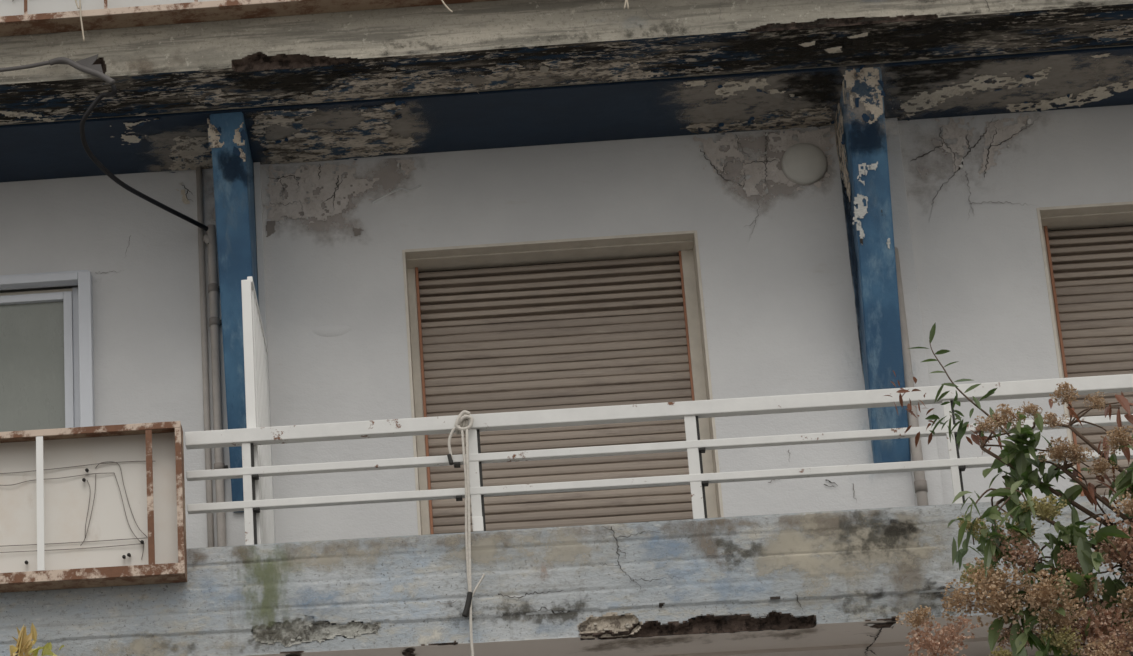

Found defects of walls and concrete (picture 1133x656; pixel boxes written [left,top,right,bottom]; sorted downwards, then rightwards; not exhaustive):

peeling [0,111,54,122]
peeling [94,14,1133,245]
crack [911,116,1041,214]
damp [234,546,250,563]
spalling [251,616,381,656]
spalling [577,596,817,640]